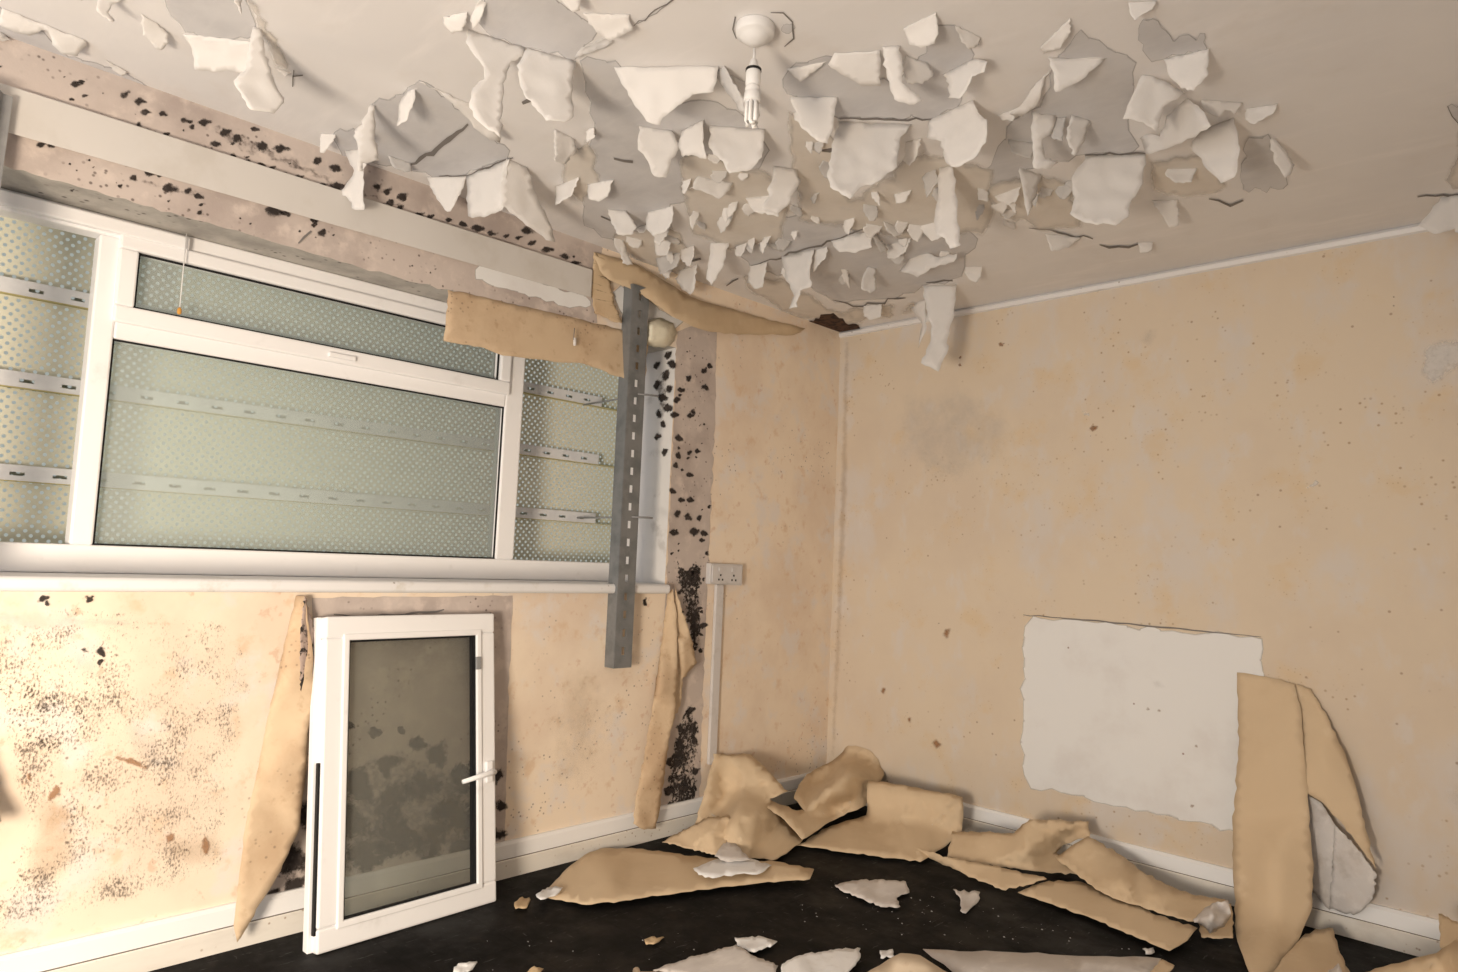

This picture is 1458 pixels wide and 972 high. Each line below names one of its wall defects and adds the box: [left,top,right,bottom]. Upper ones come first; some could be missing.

damp [116,172,204,215]
damp [121,91,344,190]
damp [265,207,335,238]
damp [365,184,581,264]
peeling [0,0,1294,372]
peeling [1417,161,1458,234]
damp [653,337,713,477]
flaking render [614,286,717,806]
damp [669,488,711,653]
damp [0,596,244,920]
flaking render [312,595,513,877]
flaking render [266,768,308,895]